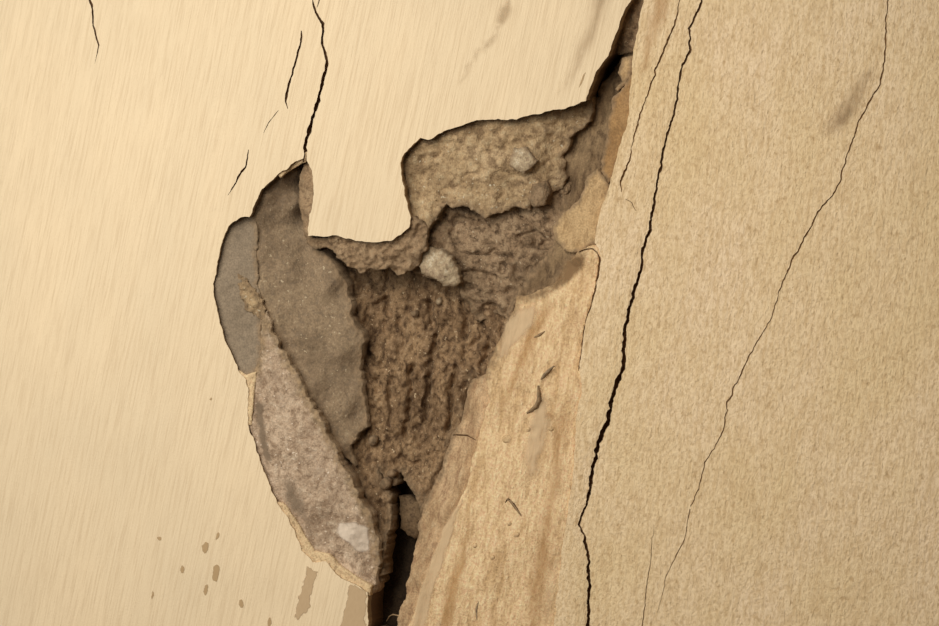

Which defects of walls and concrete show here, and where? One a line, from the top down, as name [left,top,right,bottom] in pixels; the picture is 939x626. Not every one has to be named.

crack [89,0,99,61]
crack [264,0,329,163]
crack [228,150,249,195]
spalling [214,0,644,626]
crack [578,0,703,626]
crack [642,0,889,626]
peeling [204,565,220,595]